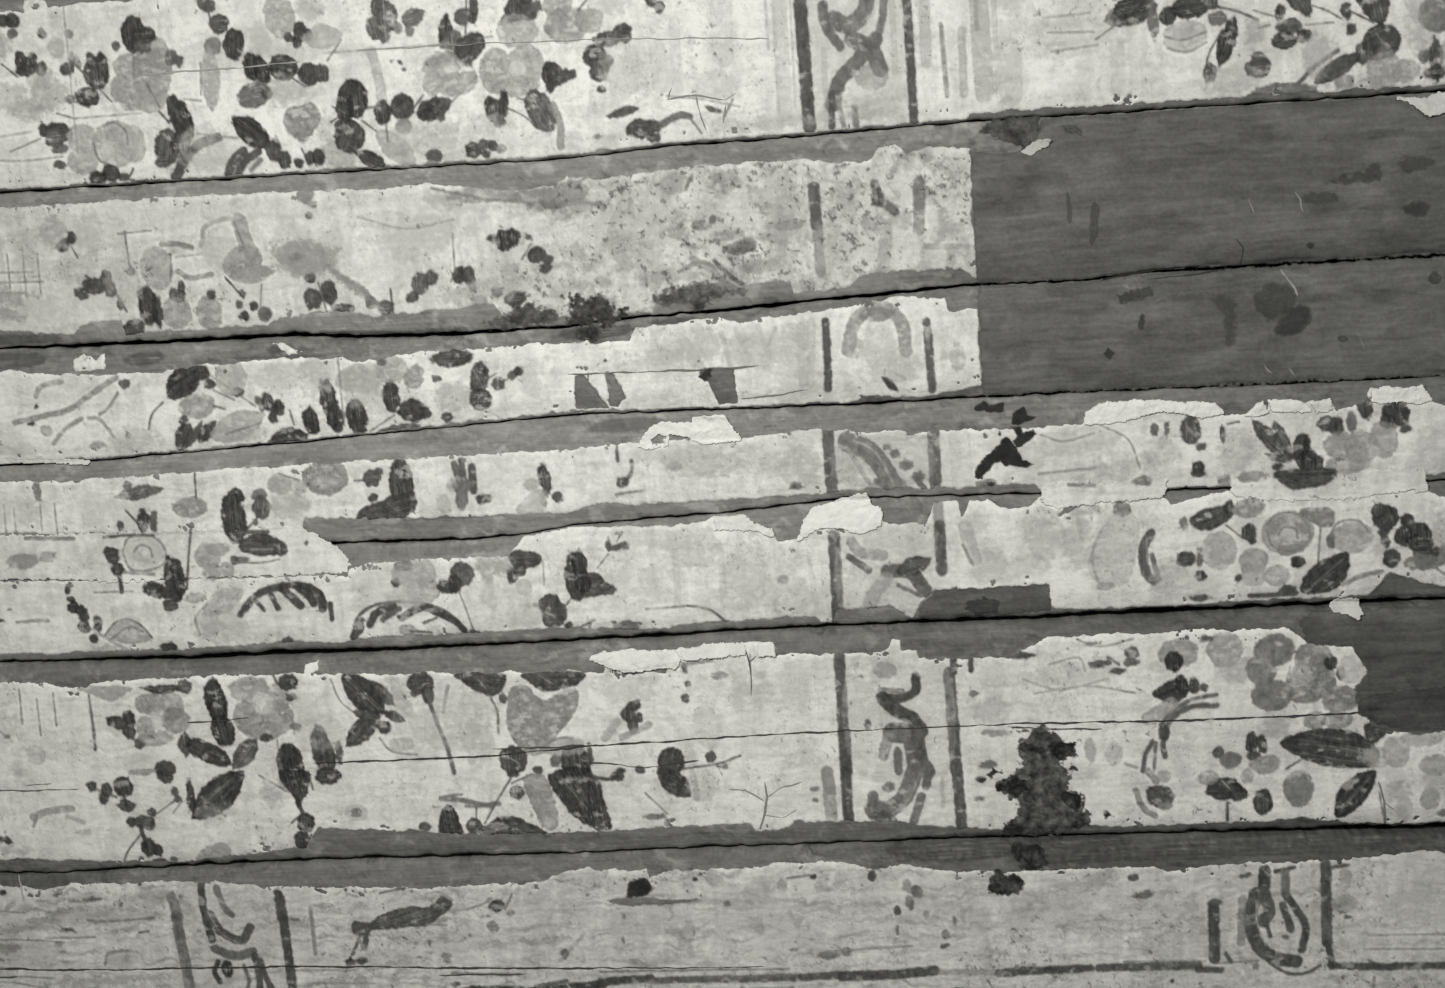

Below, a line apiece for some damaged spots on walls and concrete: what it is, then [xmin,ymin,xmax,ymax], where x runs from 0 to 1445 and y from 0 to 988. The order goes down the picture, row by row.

peeling [969,91,1445,425]
peeling [0,525,351,583]
peeling [714,515,775,537]
peeling [797,492,883,541]
peeling [1300,574,1445,735]
damp [979,724,1111,896]